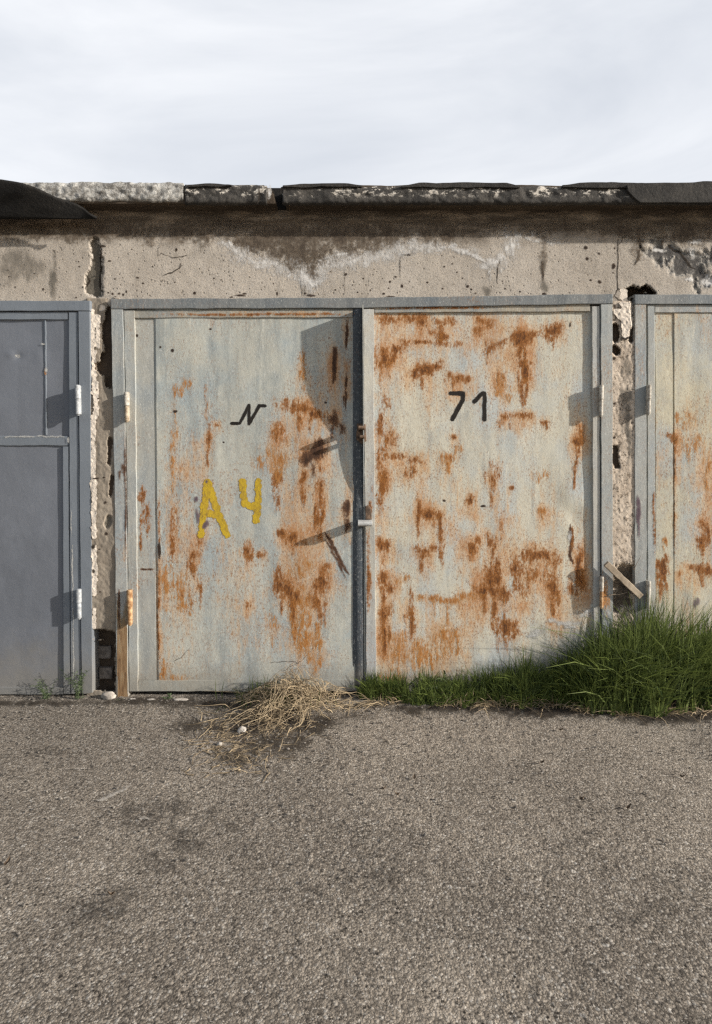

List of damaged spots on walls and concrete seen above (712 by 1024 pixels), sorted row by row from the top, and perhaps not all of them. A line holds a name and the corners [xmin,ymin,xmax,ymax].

leakage [0,215,712,295]
flaking render [635,237,712,293]
flaking render [75,238,127,692]
corrosion [119,445,204,681]
corrosion [172,312,349,671]
corrosion [342,499,351,532]
corrosion [369,306,564,515]
corrosion [366,497,587,680]
corrosion [573,424,584,489]
flaking render [612,436,620,468]
flaking render [613,566,633,613]
corrosion [652,412,712,599]